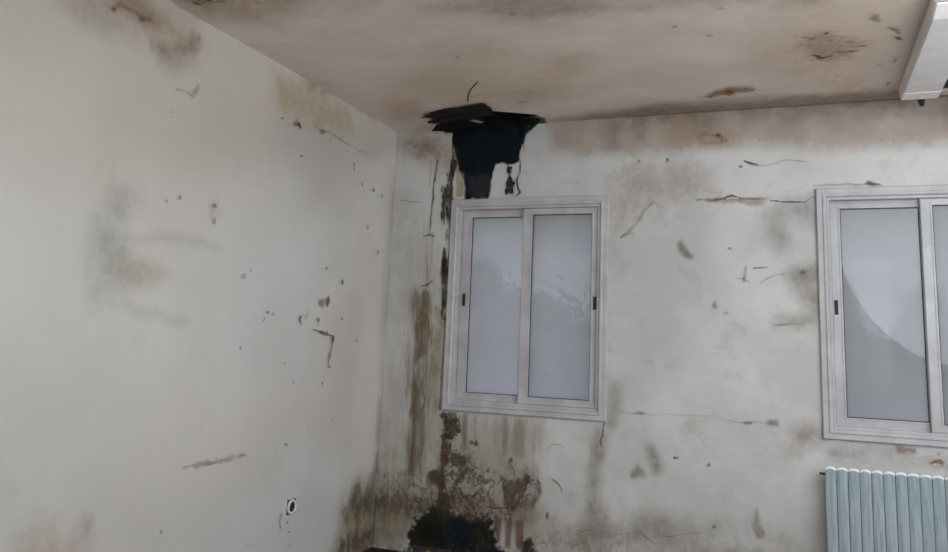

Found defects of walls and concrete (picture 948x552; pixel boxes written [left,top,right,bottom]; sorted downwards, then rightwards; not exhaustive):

crack [707,194,794,202]
crack [314,318,334,367]
leakage [342,94,948,552]